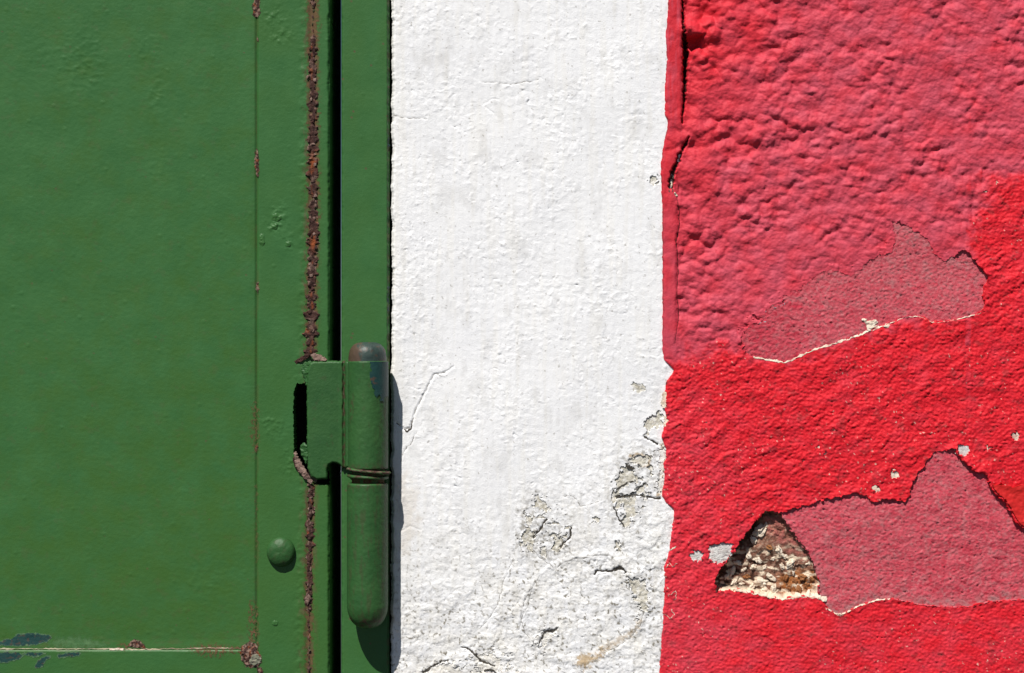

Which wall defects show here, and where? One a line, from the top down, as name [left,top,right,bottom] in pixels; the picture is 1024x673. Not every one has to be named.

rust [302,0,321,355]
crack [668,0,689,341]
peeling [741,221,988,363]
rust [293,451,316,673]
crack [397,372,447,448]
spalling [516,494,572,559]
spalling [611,391,669,528]
peeling [715,445,1024,617]
peeling [0,632,241,668]
rust [195,606,264,673]